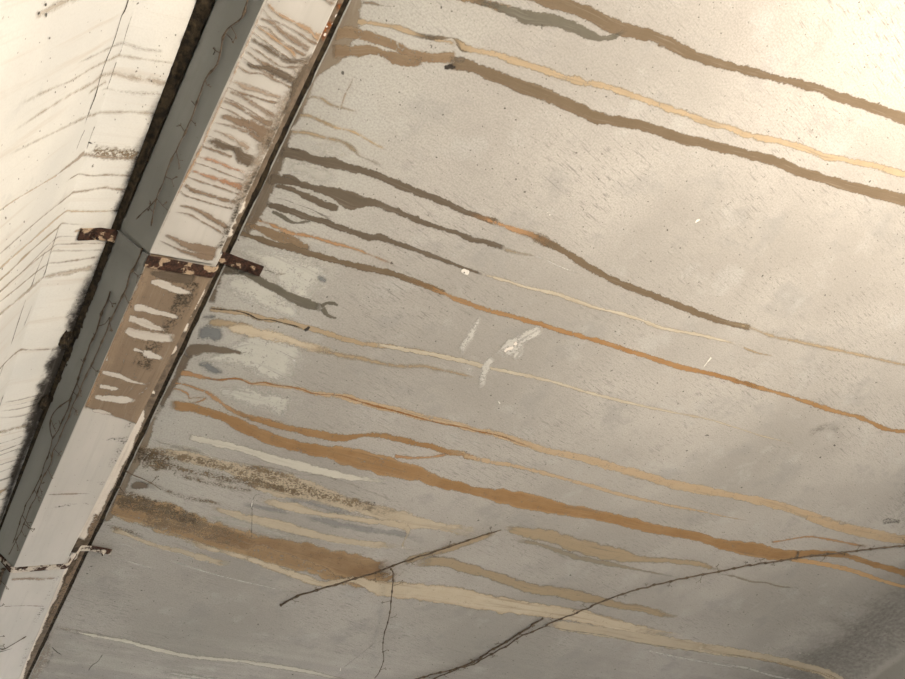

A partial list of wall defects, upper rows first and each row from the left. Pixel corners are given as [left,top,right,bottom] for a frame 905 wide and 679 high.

water stain [3,142,138,219]
water stain [242,0,729,343]
water stain [209,265,338,319]
peeling [78,410,145,539]
water stain [79,316,844,679]